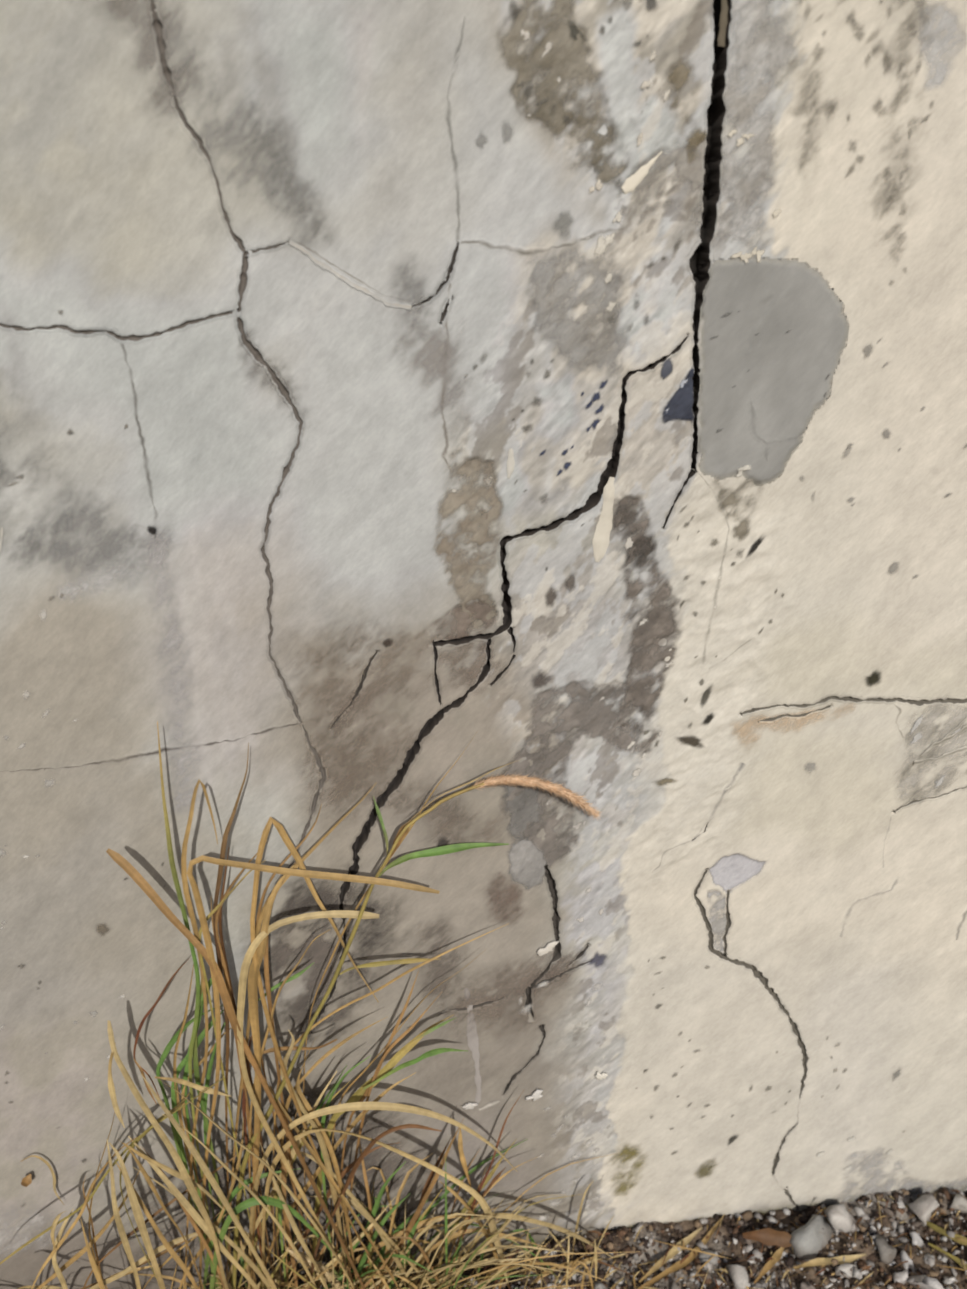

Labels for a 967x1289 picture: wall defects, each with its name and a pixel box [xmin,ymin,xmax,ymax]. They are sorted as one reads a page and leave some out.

spalling [501,0,706,368]
peeling [718,0,793,263]
water stain [49,507,134,600]
crack [0,0,624,877]
water stain [316,631,486,800]
spalling [436,457,502,639]
crack [311,0,755,1034]
water stain [534,673,549,687]
water stain [546,575,575,605]
crack [450,865,591,1111]
crack [650,761,817,1211]
peeling [708,854,765,951]